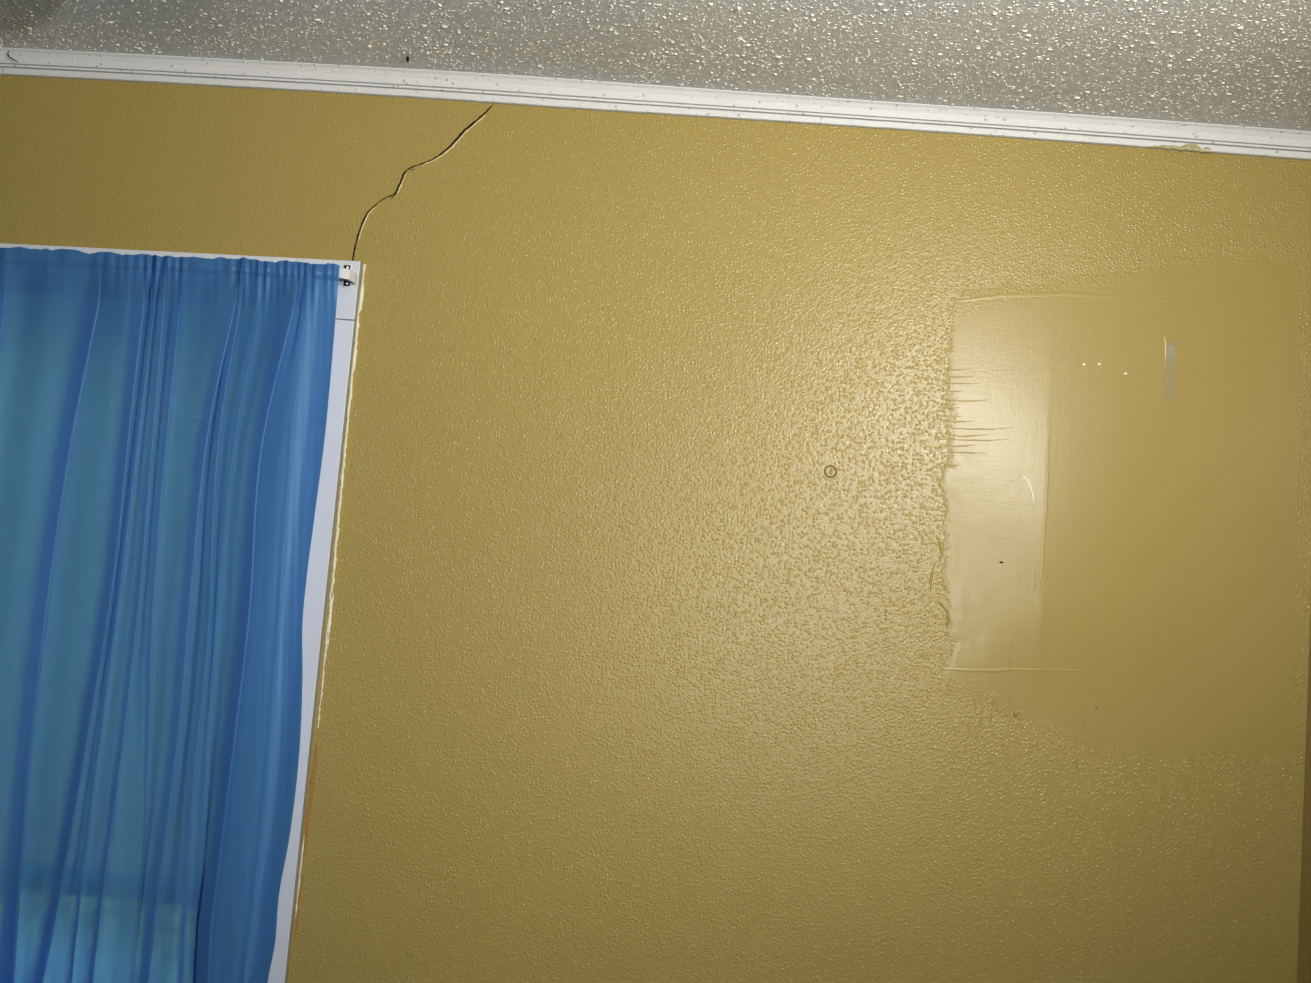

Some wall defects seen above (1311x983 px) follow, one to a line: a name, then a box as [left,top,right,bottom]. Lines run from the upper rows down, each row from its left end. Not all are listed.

crack [317,105,493,729]
crack [295,839,304,916]